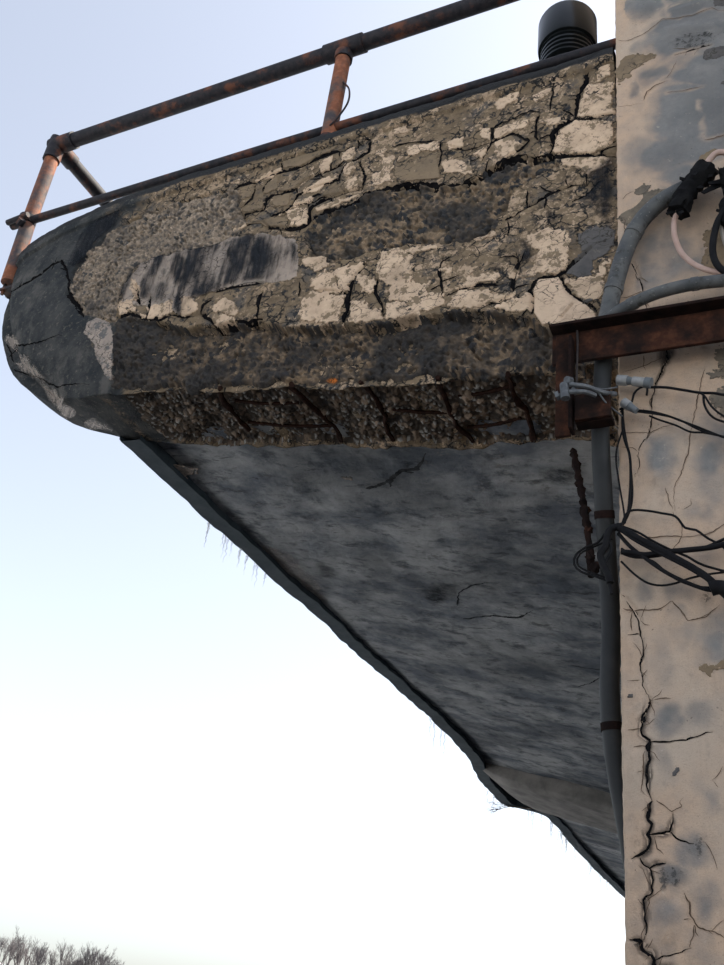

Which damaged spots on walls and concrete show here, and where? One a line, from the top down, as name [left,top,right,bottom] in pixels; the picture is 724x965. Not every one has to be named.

crack [6,258,85,317]
crack [7,334,90,388]
crack [120,282,264,336]
spalling [70,53,665,447]
crack [235,45,709,327]
crack [625,350,724,547]
crack [623,595,724,965]